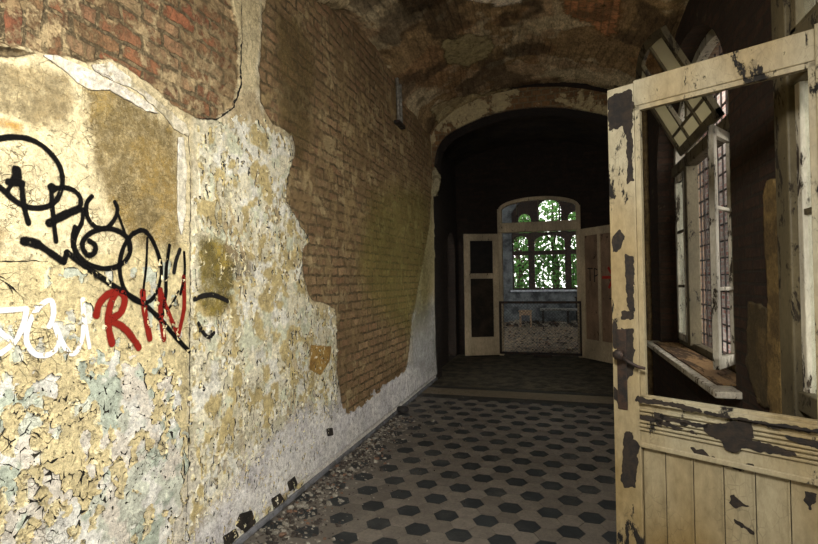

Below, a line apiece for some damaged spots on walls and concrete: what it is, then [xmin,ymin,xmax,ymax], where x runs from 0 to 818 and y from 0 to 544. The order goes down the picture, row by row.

flaking render [0,0,441,544]